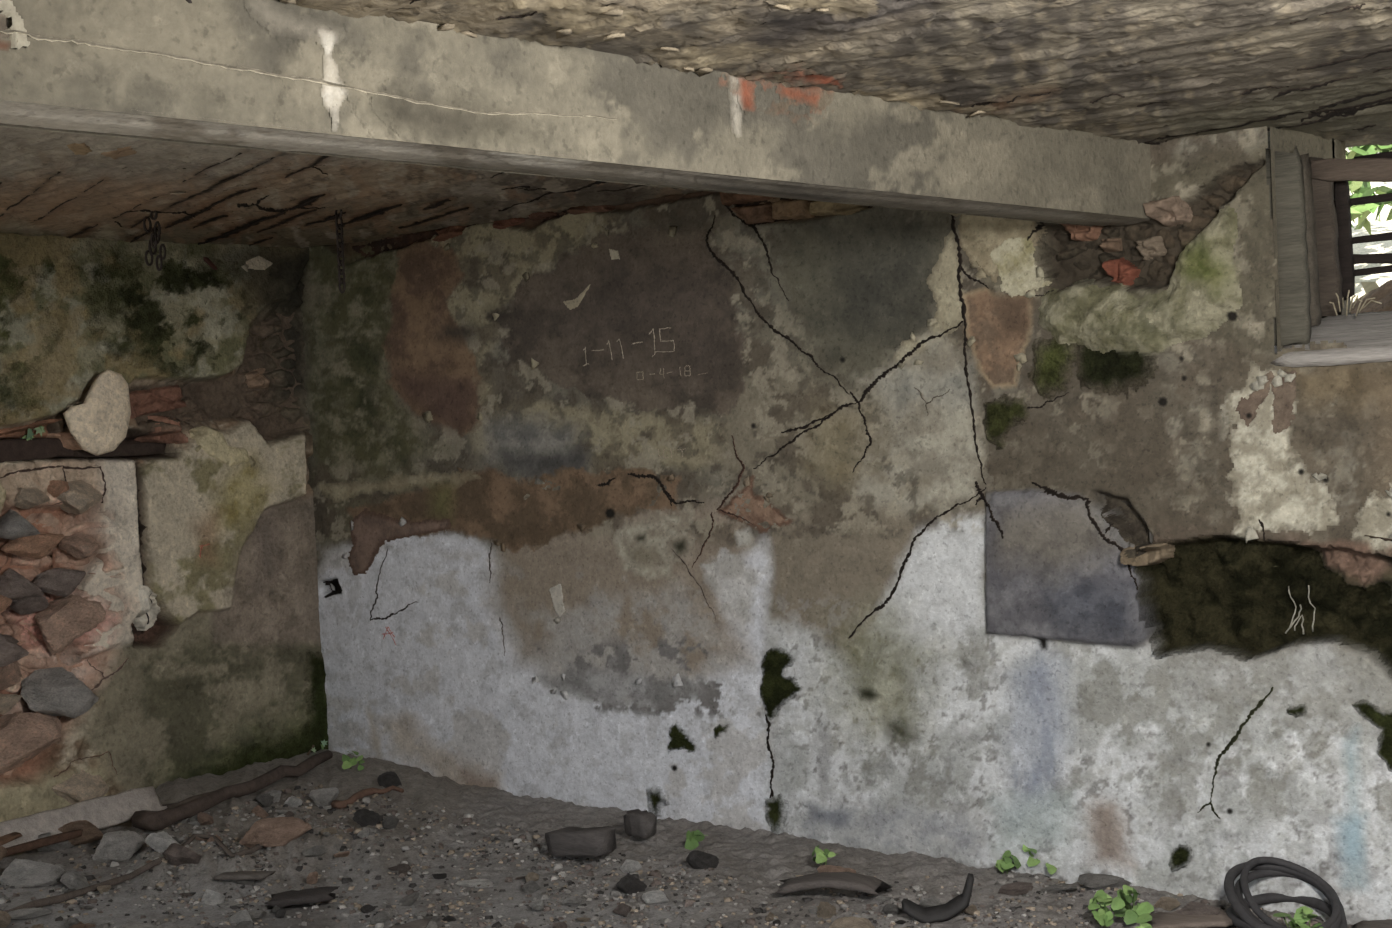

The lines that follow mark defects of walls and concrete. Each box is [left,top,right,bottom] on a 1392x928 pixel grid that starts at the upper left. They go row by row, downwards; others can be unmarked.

crack [1090,48,1392,145]
spalling [0,485,182,791]
spalling [0,322,296,467]
leakage [142,686,310,789]
leakage [184,441,286,572]
leakage [234,238,600,500]
spalling [211,463,794,666]
crack [765,714,775,807]
crack [598,205,1004,639]
spalling [897,162,1264,391]
crack [1197,687,1274,819]
spalling [1100,361,1392,677]